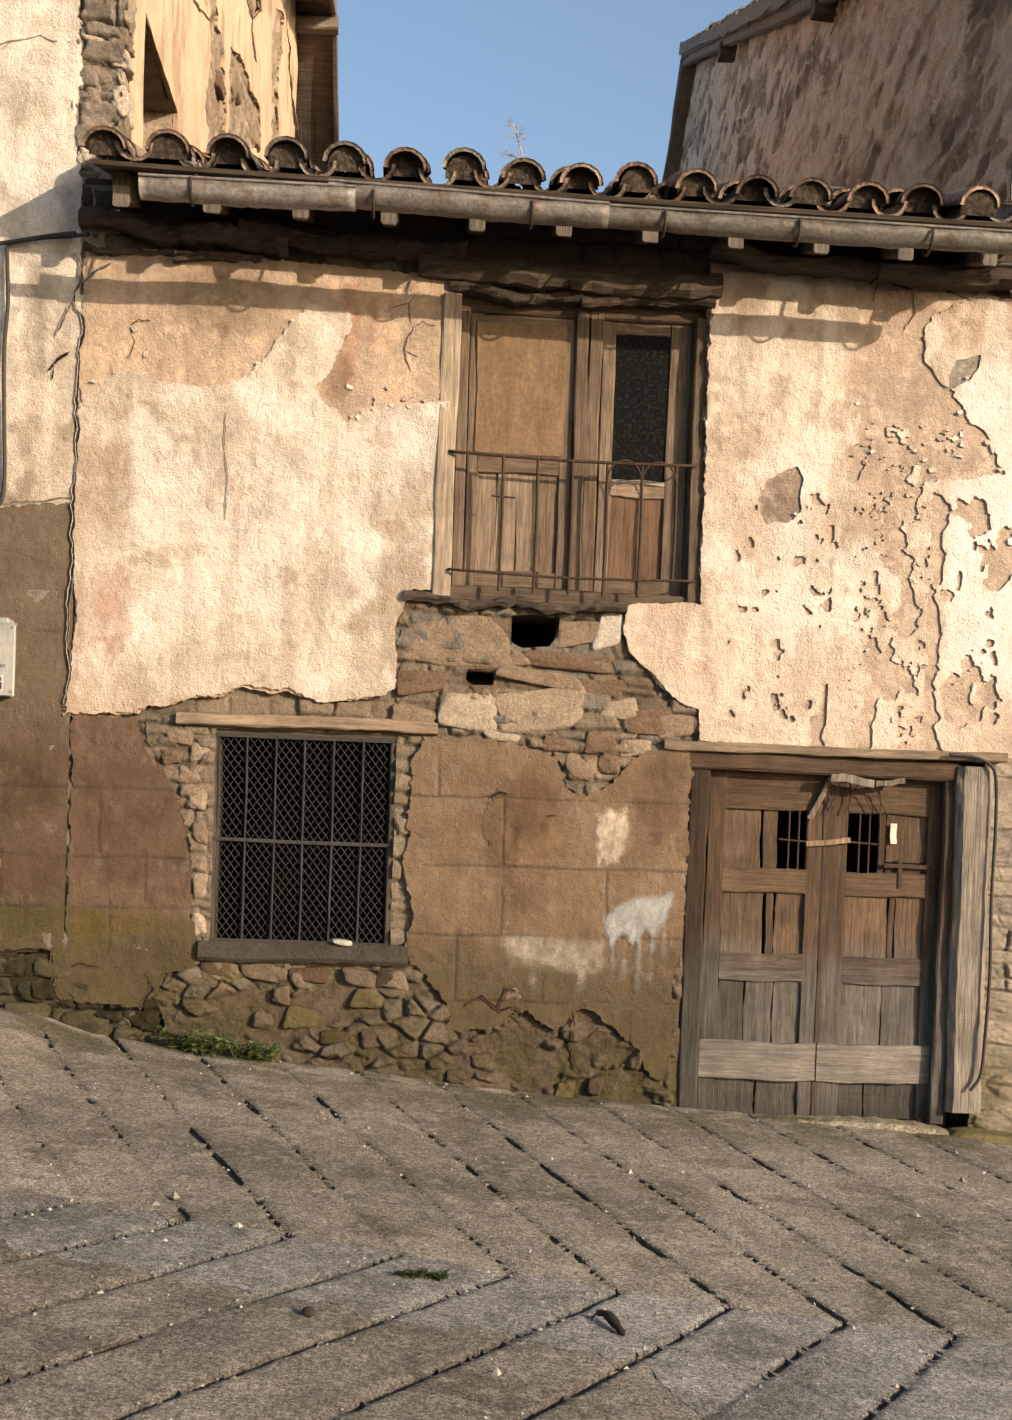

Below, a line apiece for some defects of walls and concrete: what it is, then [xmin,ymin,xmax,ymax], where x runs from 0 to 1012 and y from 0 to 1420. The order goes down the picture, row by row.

crack [0,35,70,54]
crack [193,0,210,21]
spalling [205,0,283,153]
flaking render [77,257,444,422]
flaking render [750,467,807,524]
flaking render [843,286,1005,748]
spalling [390,603,699,795]
spalling [0,718,674,1108]
damp [606,899,671,940]